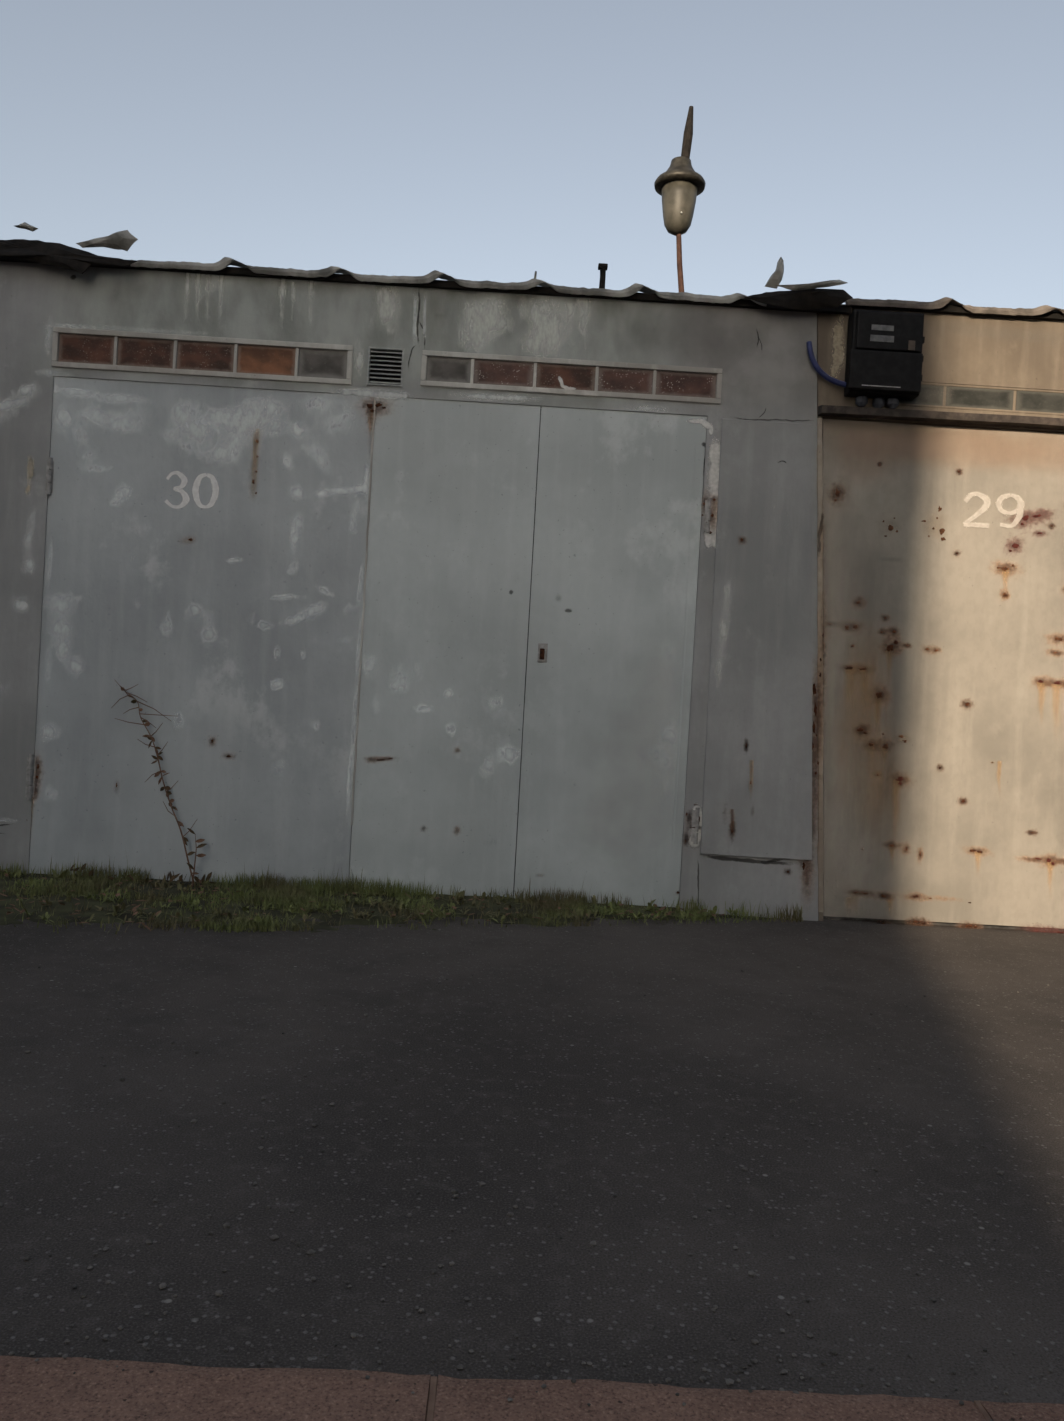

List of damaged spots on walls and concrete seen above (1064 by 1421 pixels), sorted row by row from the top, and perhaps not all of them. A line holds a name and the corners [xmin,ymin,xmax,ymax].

rust [362,401,386,419]
rust [997,511,1055,572]
rust [880,616,940,653]
rust [812,623,859,838]
rust [785,860,811,885]
rust [1024,856,1064,866]